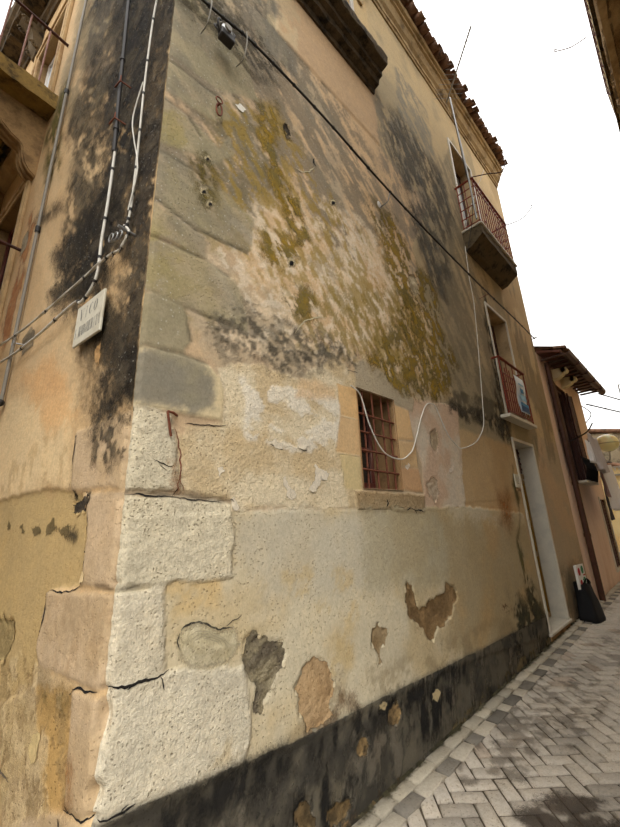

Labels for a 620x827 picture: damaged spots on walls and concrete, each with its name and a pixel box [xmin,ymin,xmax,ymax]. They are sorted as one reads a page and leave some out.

leakage [36,0,279,463]
leakage [388,114,451,299]
leakage [216,308,356,371]
spalling [7,518,69,539]
spalling [72,492,90,516]
spalling [0,614,16,665]
crack [69,669,169,695]
crack [177,615,242,649]
spalling [242,630,286,714]
spalling [294,657,336,733]
spalling [371,622,389,667]
spalling [403,582,457,645]